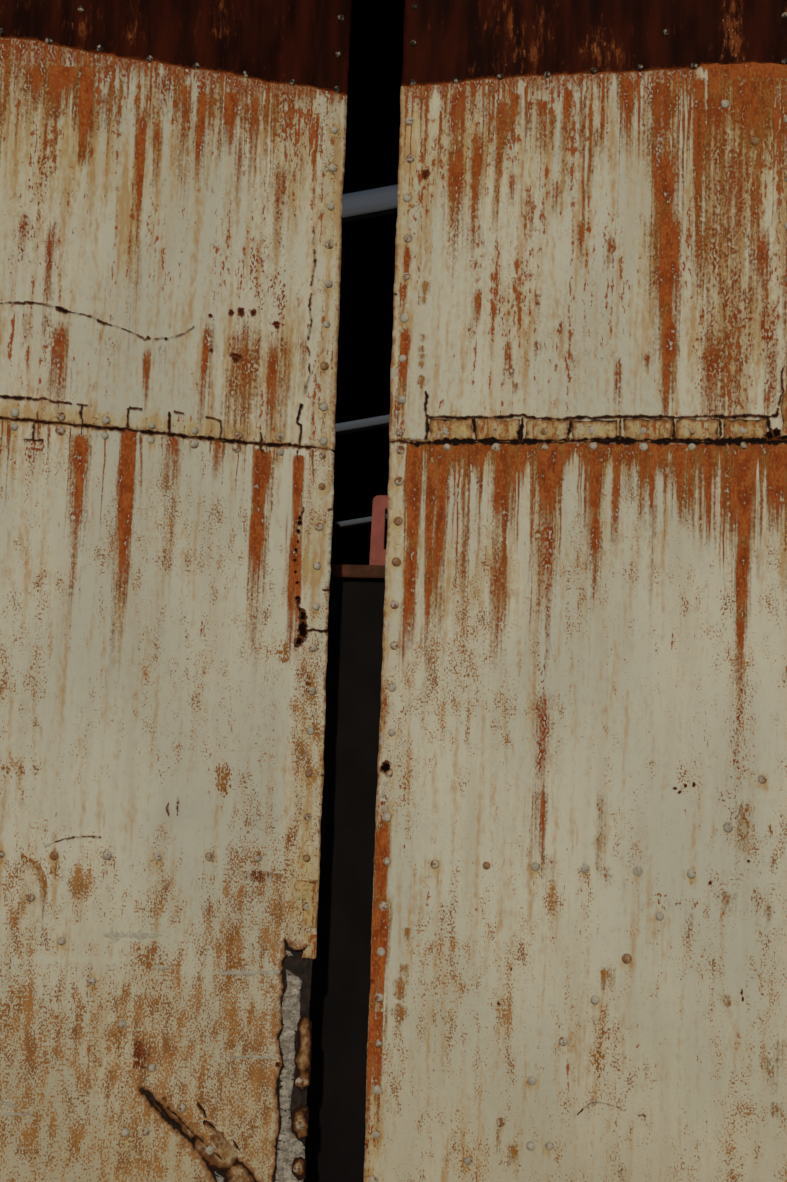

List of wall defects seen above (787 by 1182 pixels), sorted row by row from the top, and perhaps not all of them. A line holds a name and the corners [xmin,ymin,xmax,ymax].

crack [0,230,317,460]
corrosion [0,37,346,663]
corrosion [399,247,411,314]
crack [390,367,787,447]
corrosion [404,62,787,423]
crack [294,589,329,647]
corrosion [391,329,787,839]
corrosion [531,650,552,878]
peeling [155,1097,257,1182]
peeling [275,949,305,1182]
corrosion [293,1014,312,1090]
corrosion [364,769,420,1180]